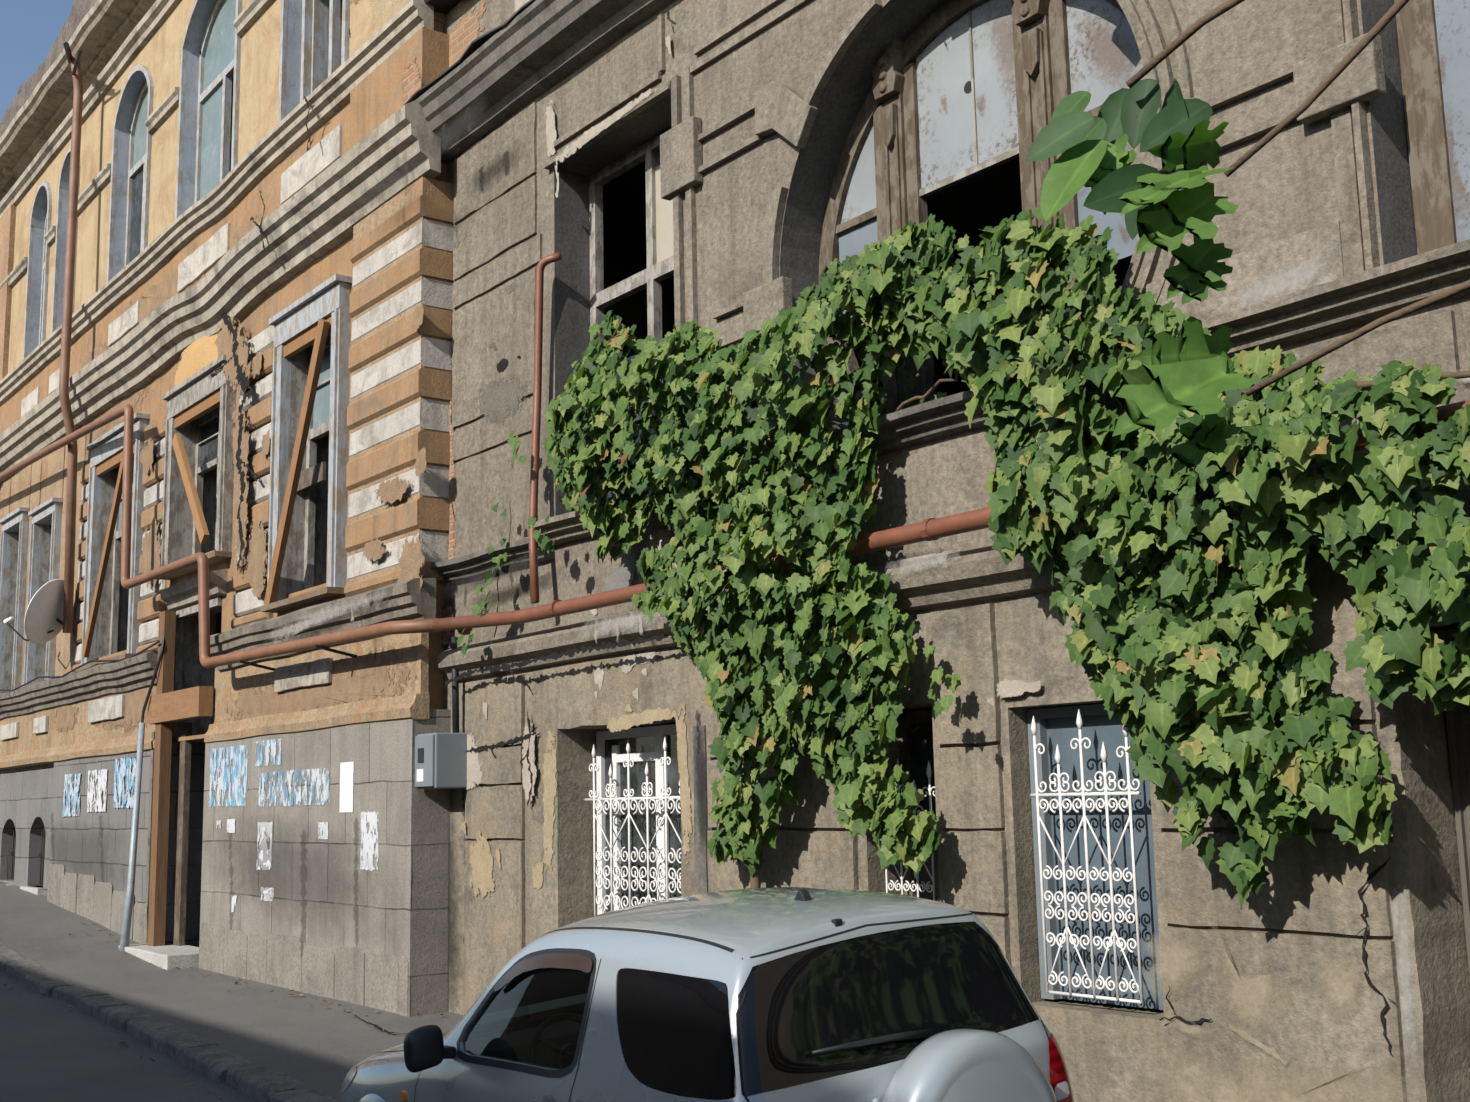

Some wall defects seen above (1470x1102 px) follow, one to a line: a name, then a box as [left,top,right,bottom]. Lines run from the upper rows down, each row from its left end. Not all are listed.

peeling [545,86,659,198]
spalling [413,305,424,333]
crack [210,313,258,574]
peeling [374,448,426,504]
spalling [448,400,456,560]
spalling [362,532,425,590]
spalling [441,583,453,648]
crack [467,712,537,806]
peeling [594,649,694,863]
peeling [460,821,501,898]
crack [1356,856,1396,1055]